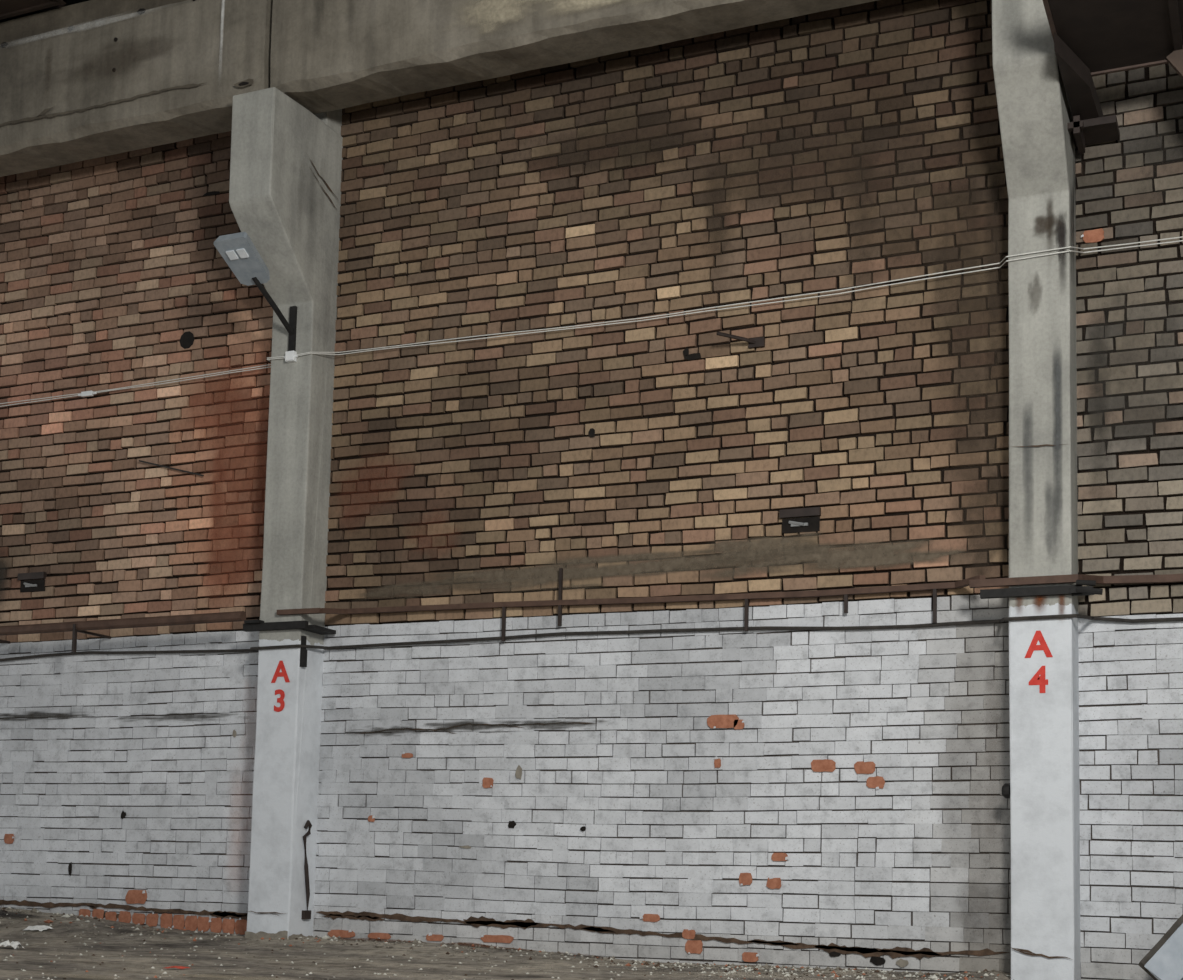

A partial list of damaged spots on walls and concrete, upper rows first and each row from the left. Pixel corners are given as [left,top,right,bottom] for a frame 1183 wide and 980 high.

water stain [1036,205,1066,265]
crack [356,722,597,734]
peeling [707,714,745,730]
peeling [811,758,836,772]
peeling [854,759,885,790]
peeling [739,873,752,886]
peeling [766,876,781,889]
crack [0,900,285,920]
peeling [79,890,309,940]
peeling [640,914,660,922]
peeling [480,935,514,943]
crack [317,911,1073,960]